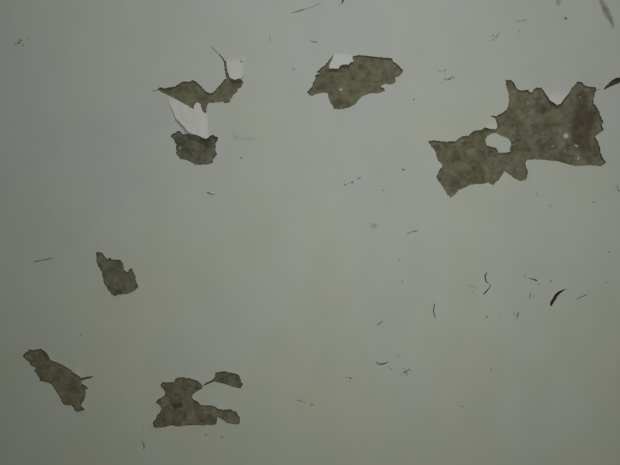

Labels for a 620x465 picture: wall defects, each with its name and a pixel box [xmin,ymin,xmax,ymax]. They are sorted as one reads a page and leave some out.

peeling [154,45,247,165]
peeling [307,53,402,109]
peeling [429,80,604,198]
peeling [97,252,138,296]
peeling [24,349,93,411]
peeling [154,371,243,427]